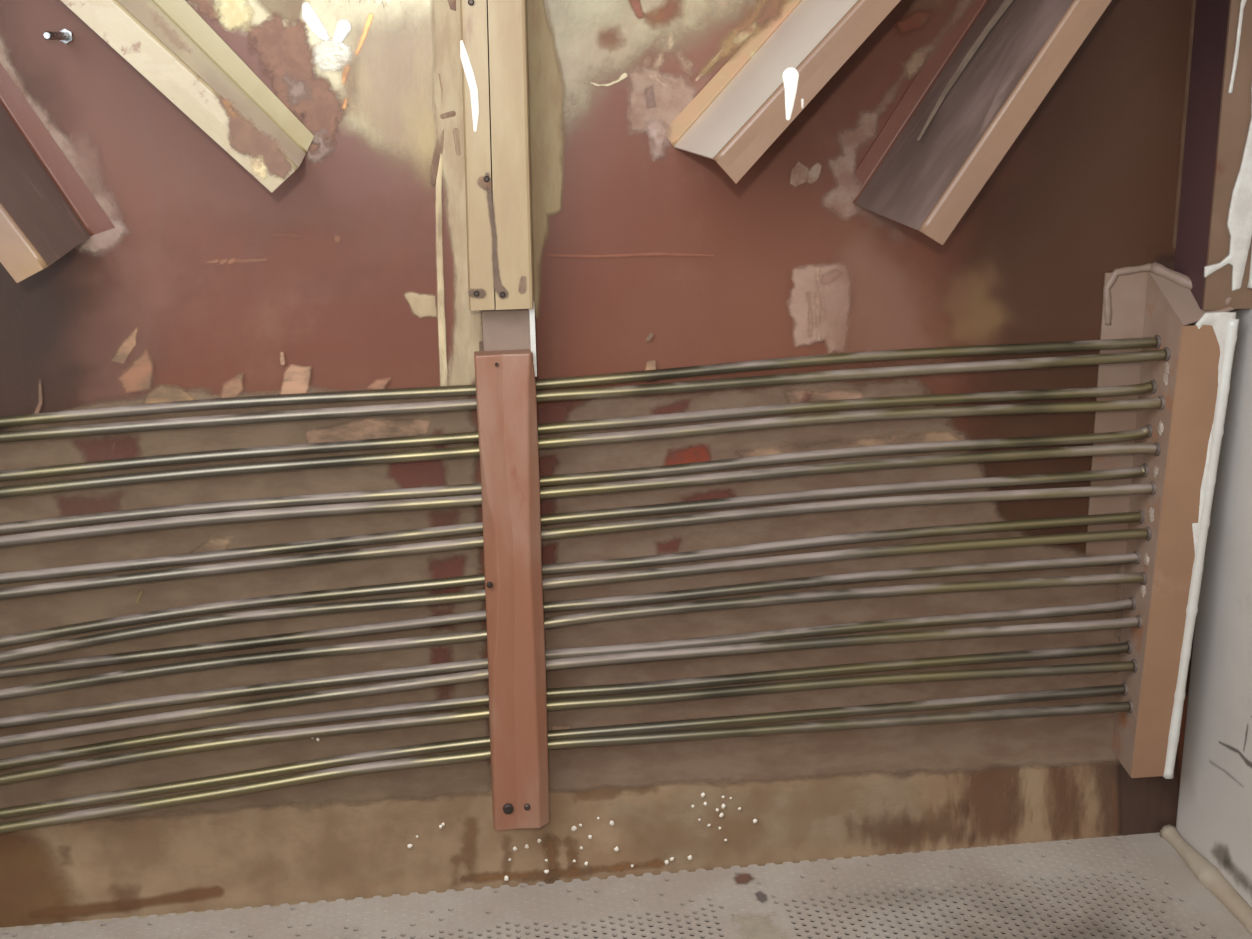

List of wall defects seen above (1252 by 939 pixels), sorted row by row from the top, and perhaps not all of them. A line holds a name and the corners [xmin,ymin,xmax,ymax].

peeling [192,0,348,162]